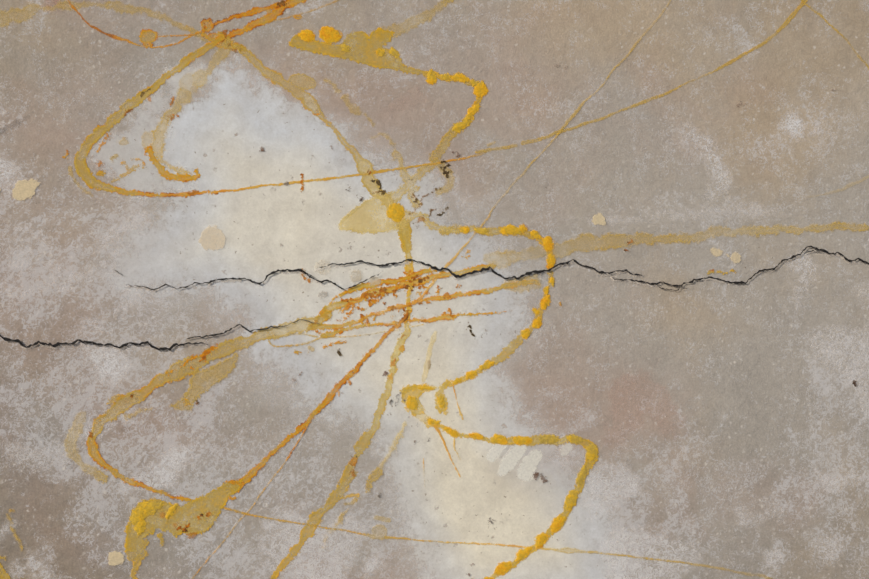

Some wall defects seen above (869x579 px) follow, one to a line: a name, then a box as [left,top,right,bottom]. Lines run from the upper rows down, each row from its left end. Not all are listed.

crack [115,246,869,291]
crack [0,319,320,351]